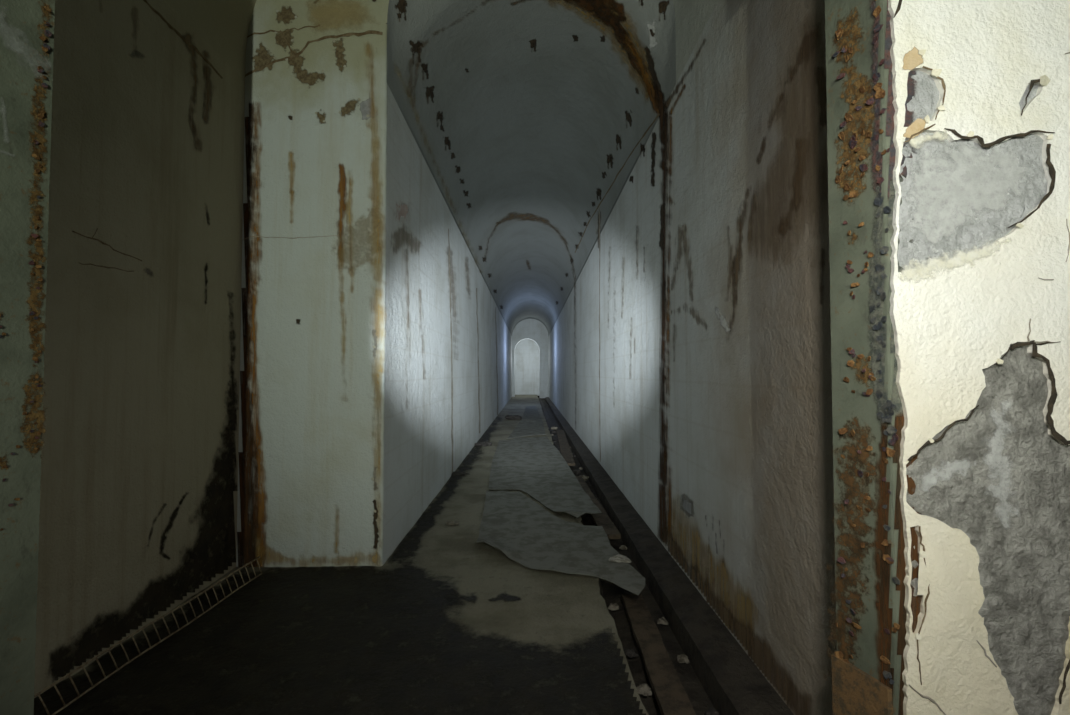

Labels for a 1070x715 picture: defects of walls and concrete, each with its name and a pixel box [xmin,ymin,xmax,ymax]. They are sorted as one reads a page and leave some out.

corrosion [0,0,52,482]
corrosion [237,103,267,567]
crack [143,0,383,79]
flaking render [252,6,325,88]
flaking render [333,38,347,72]
corrosion [338,164,353,302]
peeling [338,97,375,120]
corrosion [479,110,632,317]
corrosion [549,0,704,544]
flaking render [868,0,1070,715]
leakage [34,312,646,715]
corrosion [825,417,877,678]